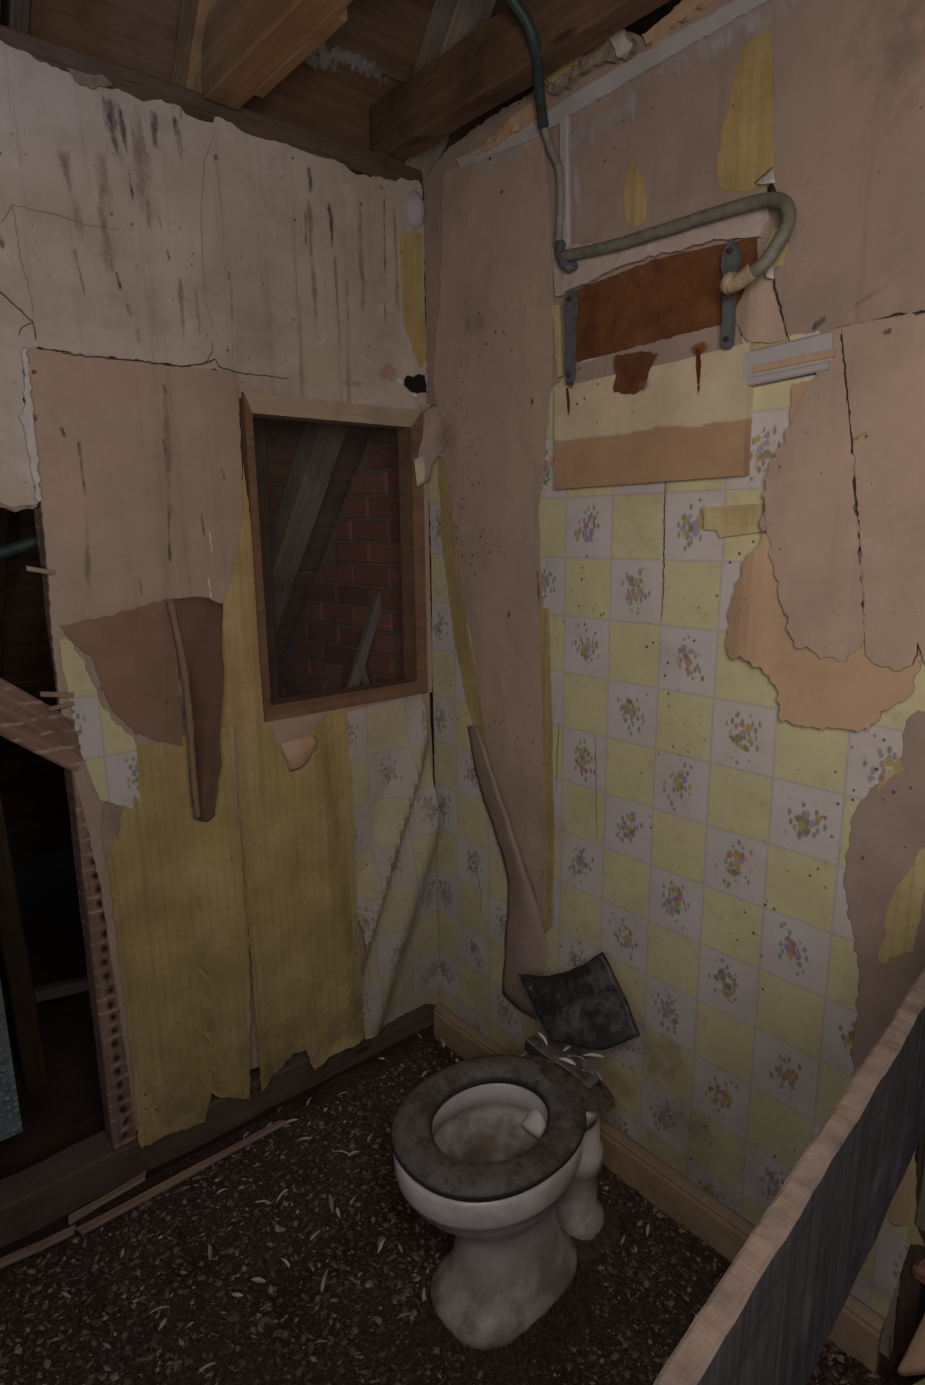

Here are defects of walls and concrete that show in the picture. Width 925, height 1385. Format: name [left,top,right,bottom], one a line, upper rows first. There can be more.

spalling [476,0,713,156]
peeling [754,167,775,184]
crack [0,136,289,379]
peeling [613,351,658,395]
crack [834,310,925,641]